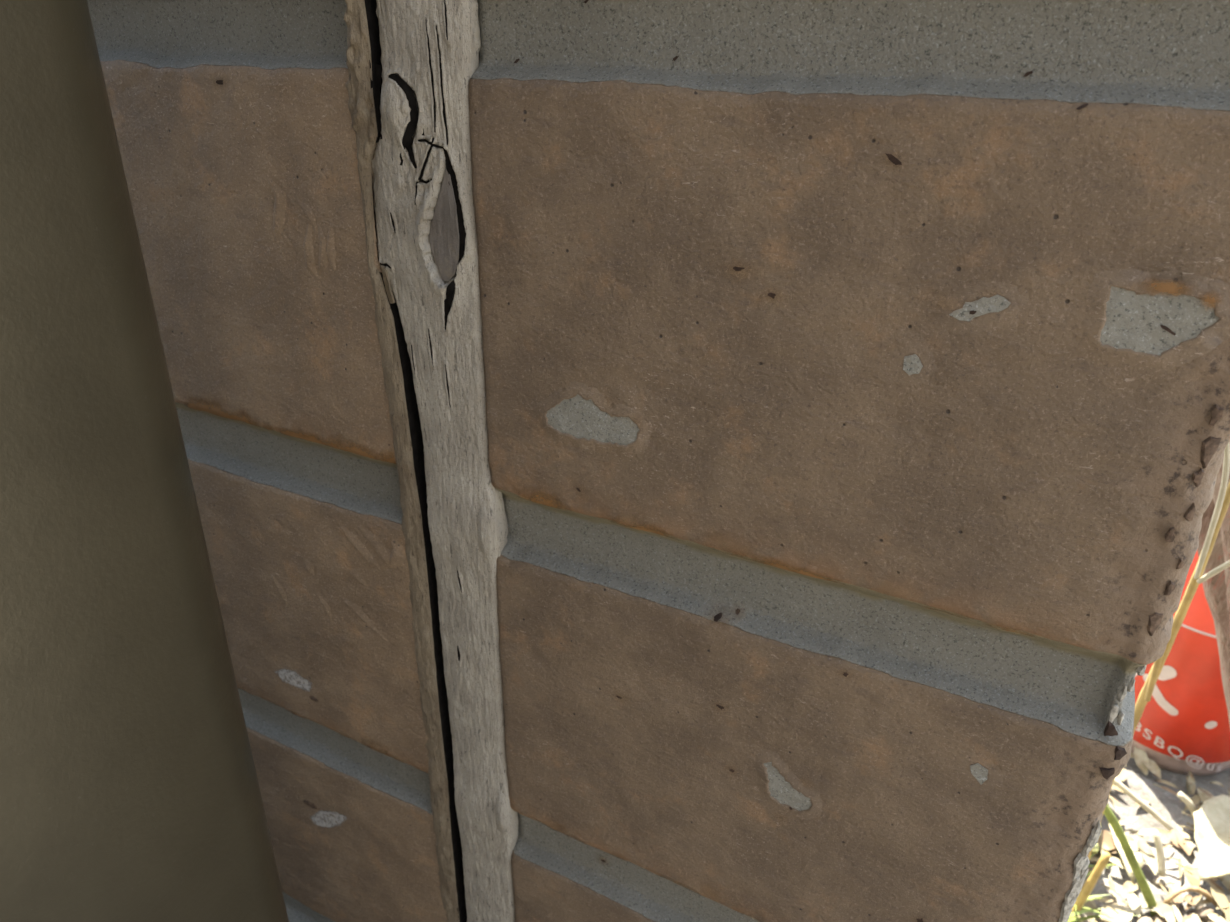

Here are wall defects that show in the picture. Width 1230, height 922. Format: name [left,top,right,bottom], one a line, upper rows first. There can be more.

peeling [938,281,1029,336]
peeling [1079,268,1230,374]
peeling [535,381,653,457]
crack [364,0,467,922]
peeling [755,751,823,820]